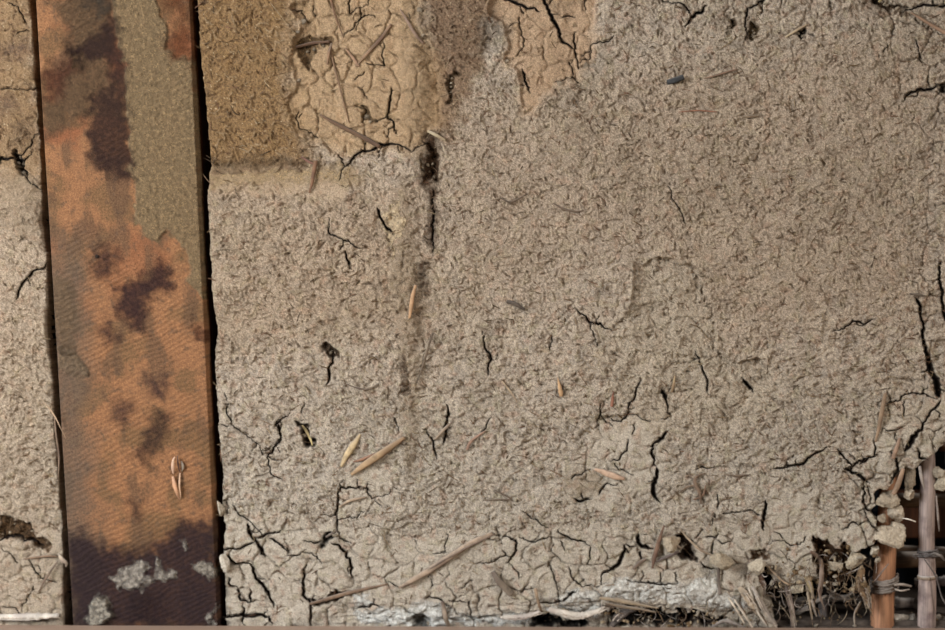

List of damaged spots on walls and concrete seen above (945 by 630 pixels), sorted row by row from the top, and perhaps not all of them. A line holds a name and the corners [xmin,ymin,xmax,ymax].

damp [68,0,134,178]
crack [508,0,614,92]
crack [905,84,944,98]
crack [338,88,435,249]
damp [116,263,174,330]
crack [215,393,303,479]
crack [427,406,449,459]
crack [572,380,668,503]
damp [69,520,223,626]
crack [222,479,391,626]
crack [425,511,678,617]
crack [696,495,806,569]